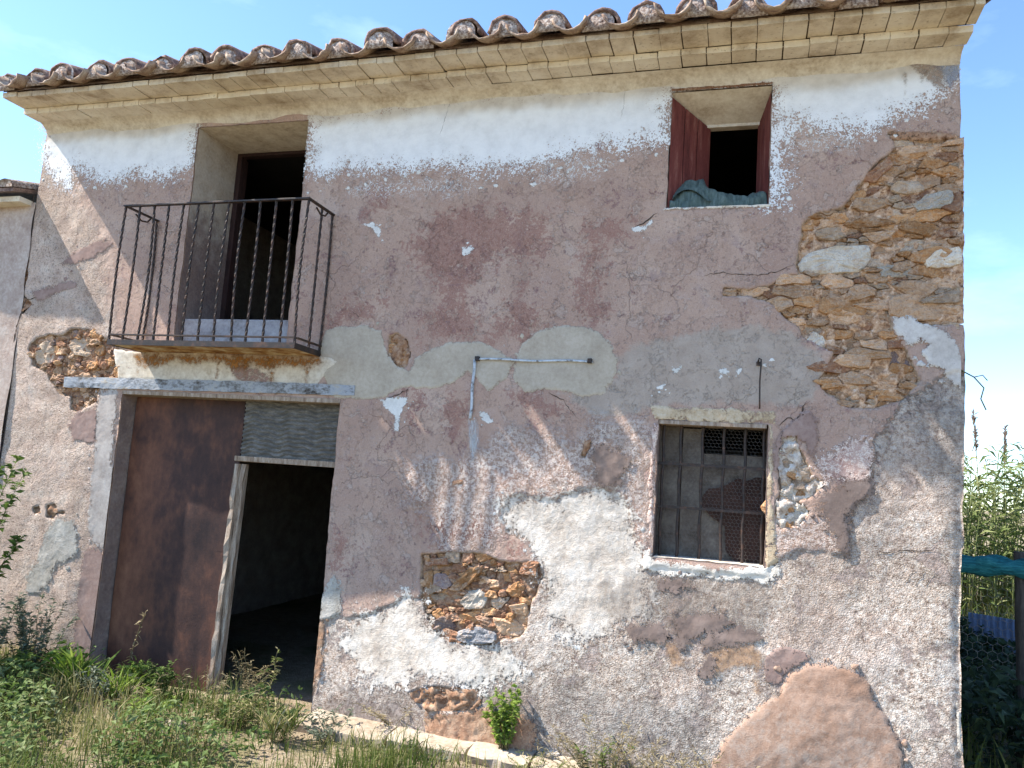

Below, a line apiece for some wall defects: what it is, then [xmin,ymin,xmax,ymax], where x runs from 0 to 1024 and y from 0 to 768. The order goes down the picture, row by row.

flaking render [27,328,129,661]
corrosion [135,353,322,379]
spalling [389,334,411,368]
flaking render [312,442,811,752]
flaking render [760,401,882,561]
flaking render [723,60,965,408]